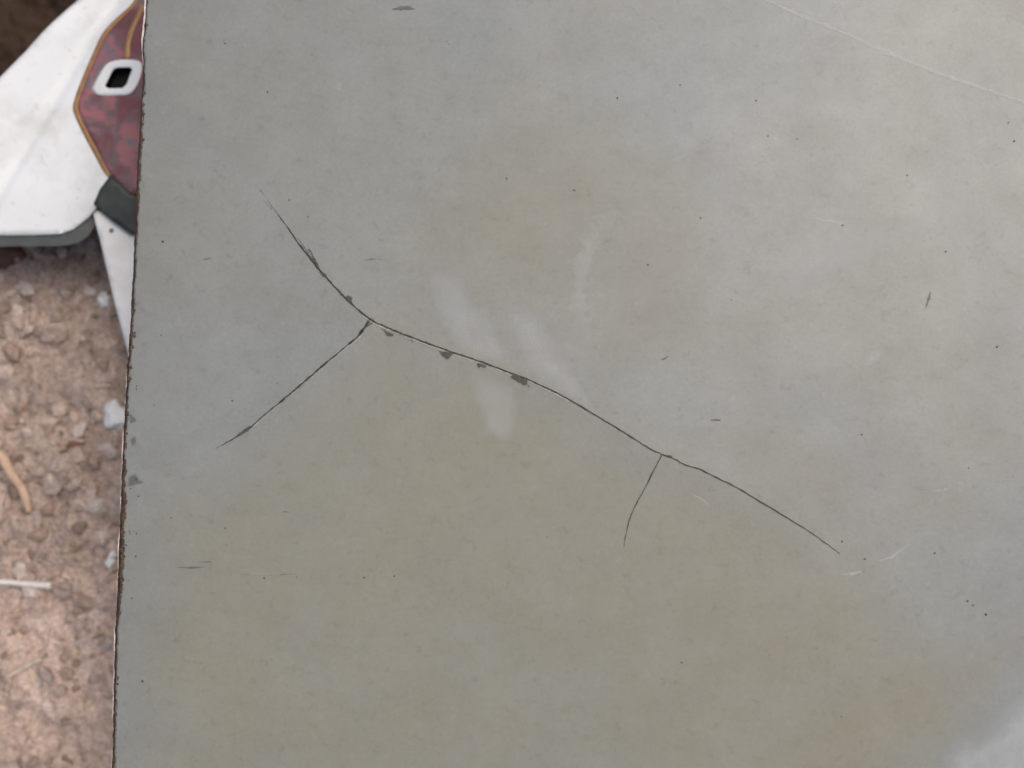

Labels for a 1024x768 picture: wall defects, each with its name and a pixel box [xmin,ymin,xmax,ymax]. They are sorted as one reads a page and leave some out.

crack [217,190,840,554]